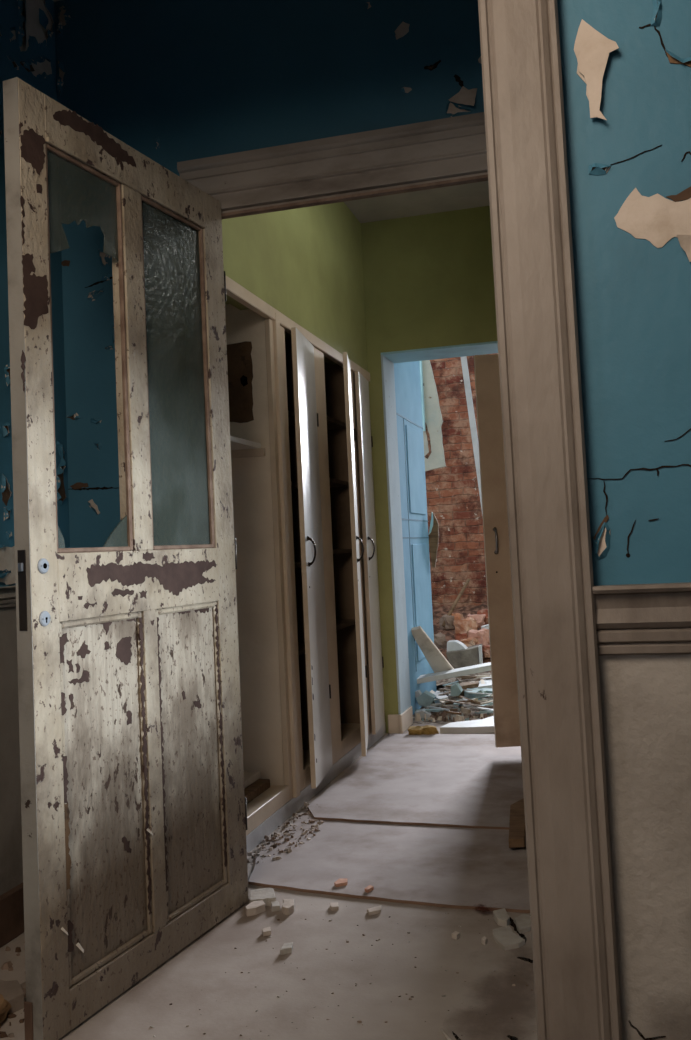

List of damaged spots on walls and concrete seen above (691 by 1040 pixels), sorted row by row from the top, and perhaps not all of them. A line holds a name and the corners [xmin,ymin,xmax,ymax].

peeling [17,0,54,79]
peeling [639,0,691,67]
peeling [446,74,477,117]
peeling [574,19,619,121]
peeling [589,145,661,175]
peeling [614,186,691,262]
crack [590,429,691,480]
peeling [1,473,12,521]
crack [627,518,659,554]
peeling [0,545,16,587]